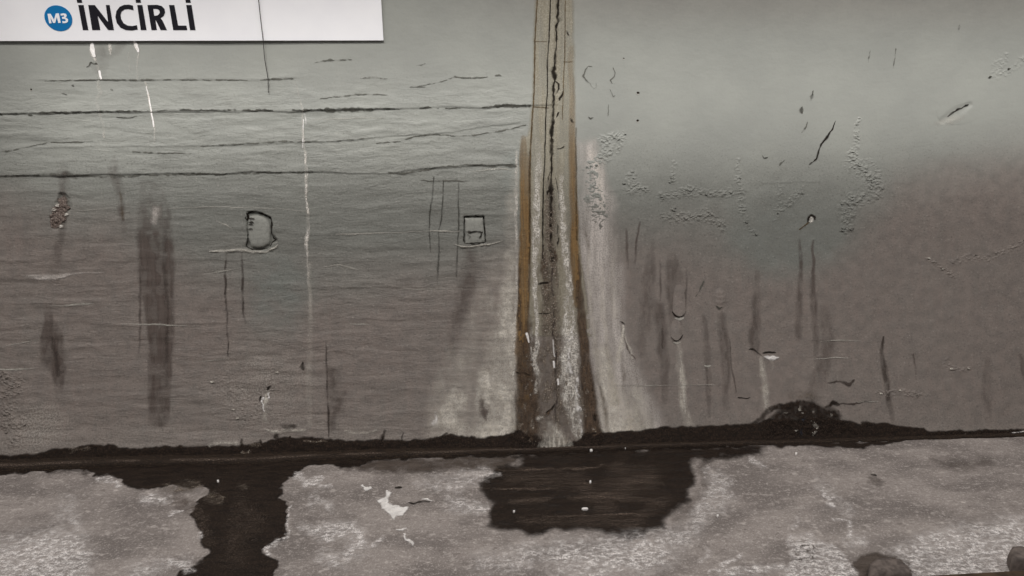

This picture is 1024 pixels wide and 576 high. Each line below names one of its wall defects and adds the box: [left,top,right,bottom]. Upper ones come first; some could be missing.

crack [0,59,395,118]
crack [3,140,310,178]
crack [809,121,836,165]
spalling [49,194,70,228]
spalling [245,211,276,250]
crack [337,0,573,422]
rust [516,167,538,441]
rust [570,152,601,436]
leakage [0,143,1024,576]